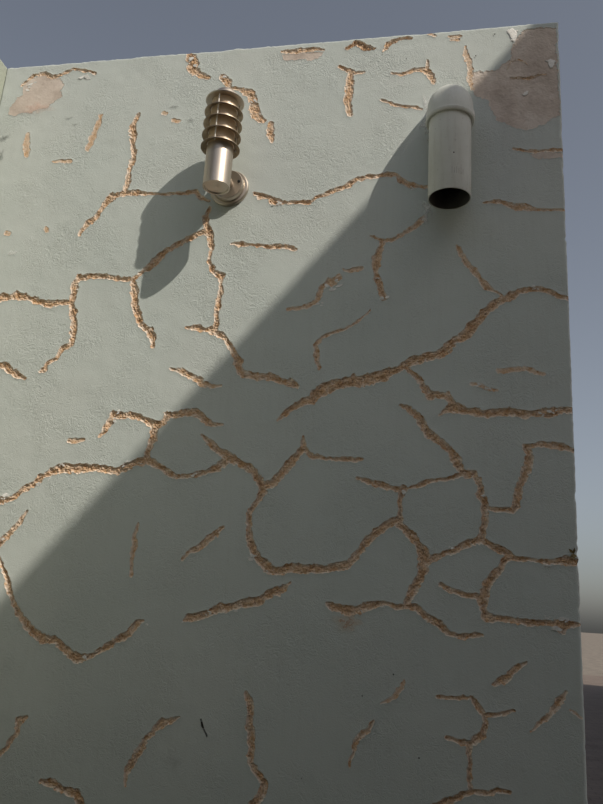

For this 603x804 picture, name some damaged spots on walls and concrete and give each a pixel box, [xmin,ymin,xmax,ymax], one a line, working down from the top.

crack [281,46,325,54]
peeling [8,75,64,116]
crack [338,65,366,117]
peeling [473,27,561,130]
crack [0,112,581,664]
crack [491,661,528,687]
crack [0,715,28,757]
crack [123,716,180,787]
crack [244,690,268,804]
crack [432,694,516,804]
crack [530,690,568,733]
crack [38,778,84,804]